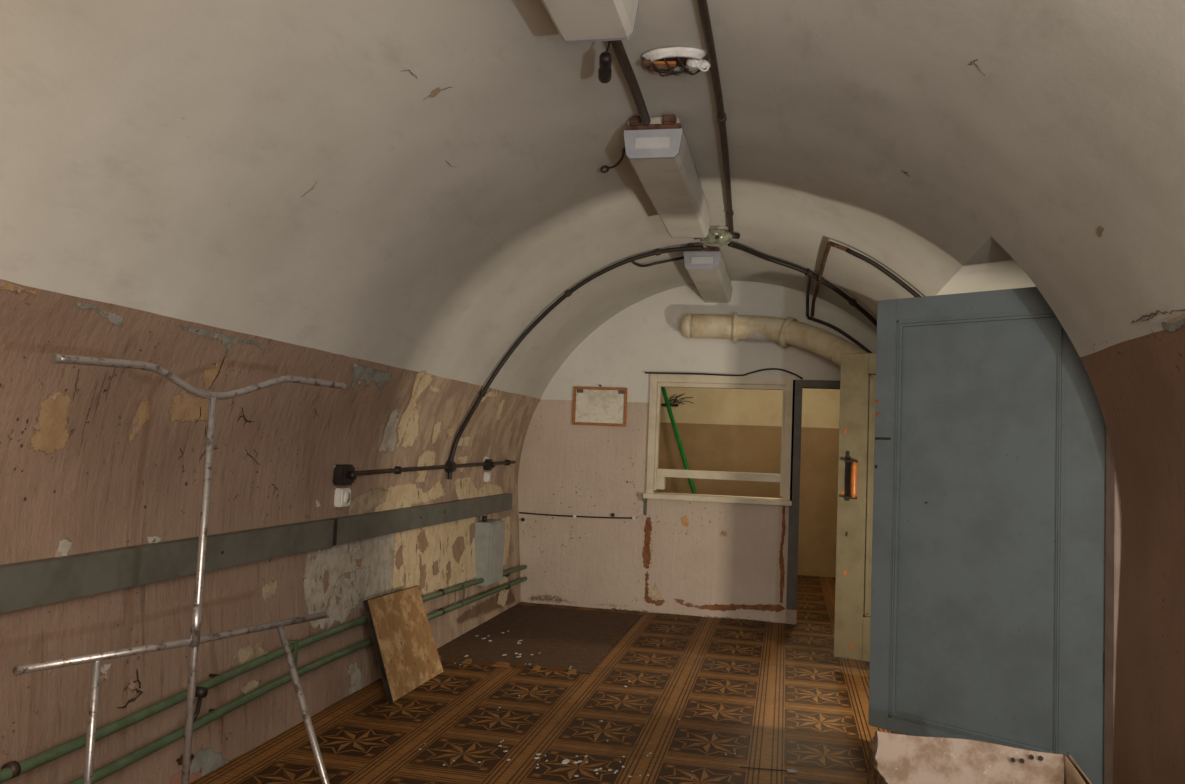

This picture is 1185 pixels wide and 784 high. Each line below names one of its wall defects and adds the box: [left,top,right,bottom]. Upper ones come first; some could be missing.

peeling [348,370,505,516]
peeling [303,517,476,630]